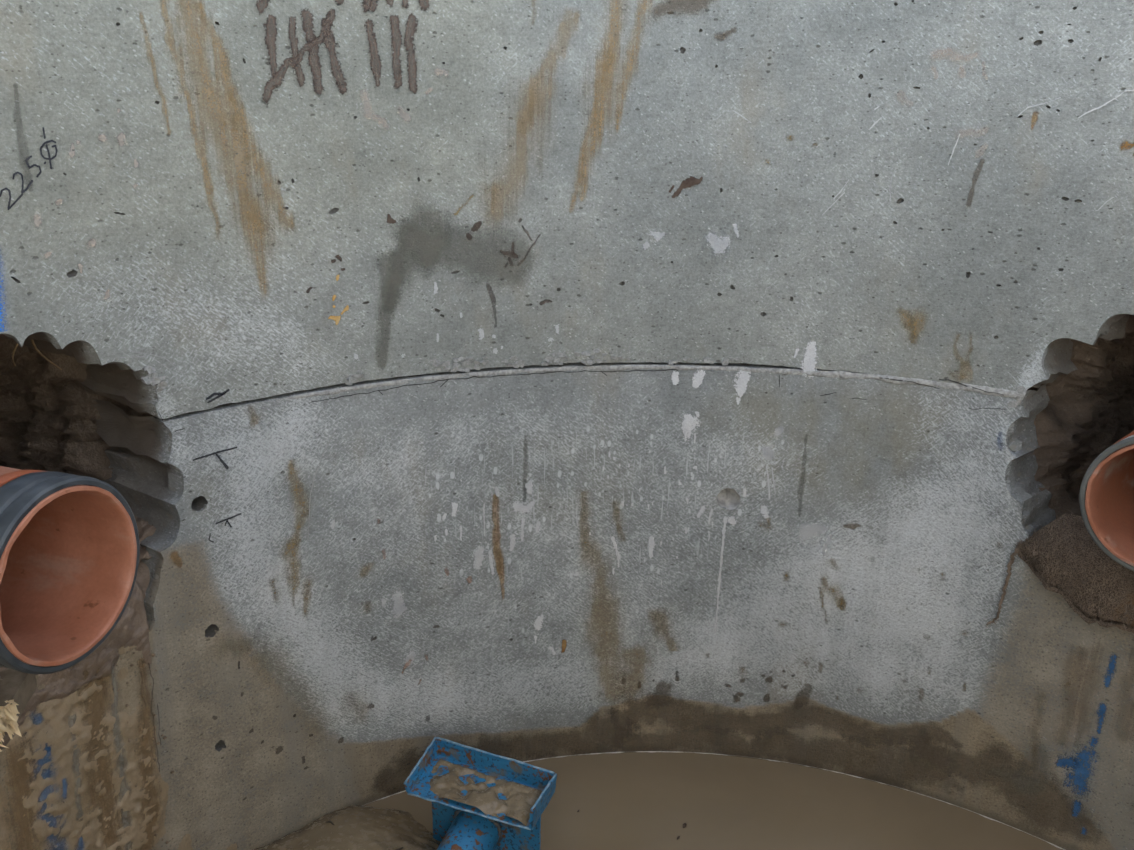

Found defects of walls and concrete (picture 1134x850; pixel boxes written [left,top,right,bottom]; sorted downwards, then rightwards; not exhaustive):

corrosion [162,0,294,290]
corrosion [570,0,651,210]
crack [312,362,676,402]
crack [821,378,1005,410]
corrosion [581,497,651,700]